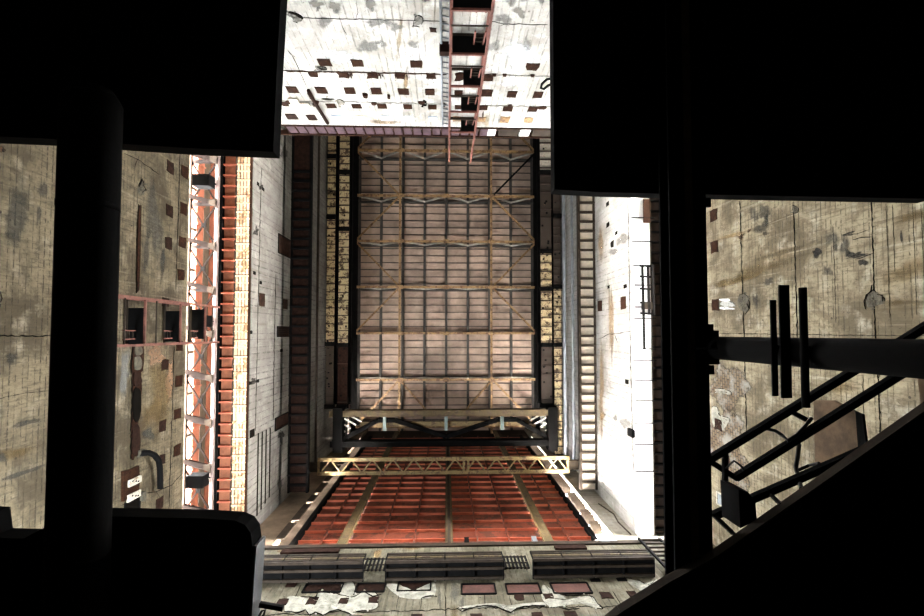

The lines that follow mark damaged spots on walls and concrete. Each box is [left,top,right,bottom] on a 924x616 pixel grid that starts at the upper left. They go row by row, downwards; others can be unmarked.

leakage [310,1,340,27]
leakage [366,0,403,31]
leakage [496,0,524,25]
crack [720,201,770,337]
crack [792,202,924,339]
crack [0,332,50,340]
crack [741,362,749,431]
crack [863,375,882,433]
flaking render [710,364,751,492]
flaking render [284,580,437,616]
flaking render [457,585,603,613]